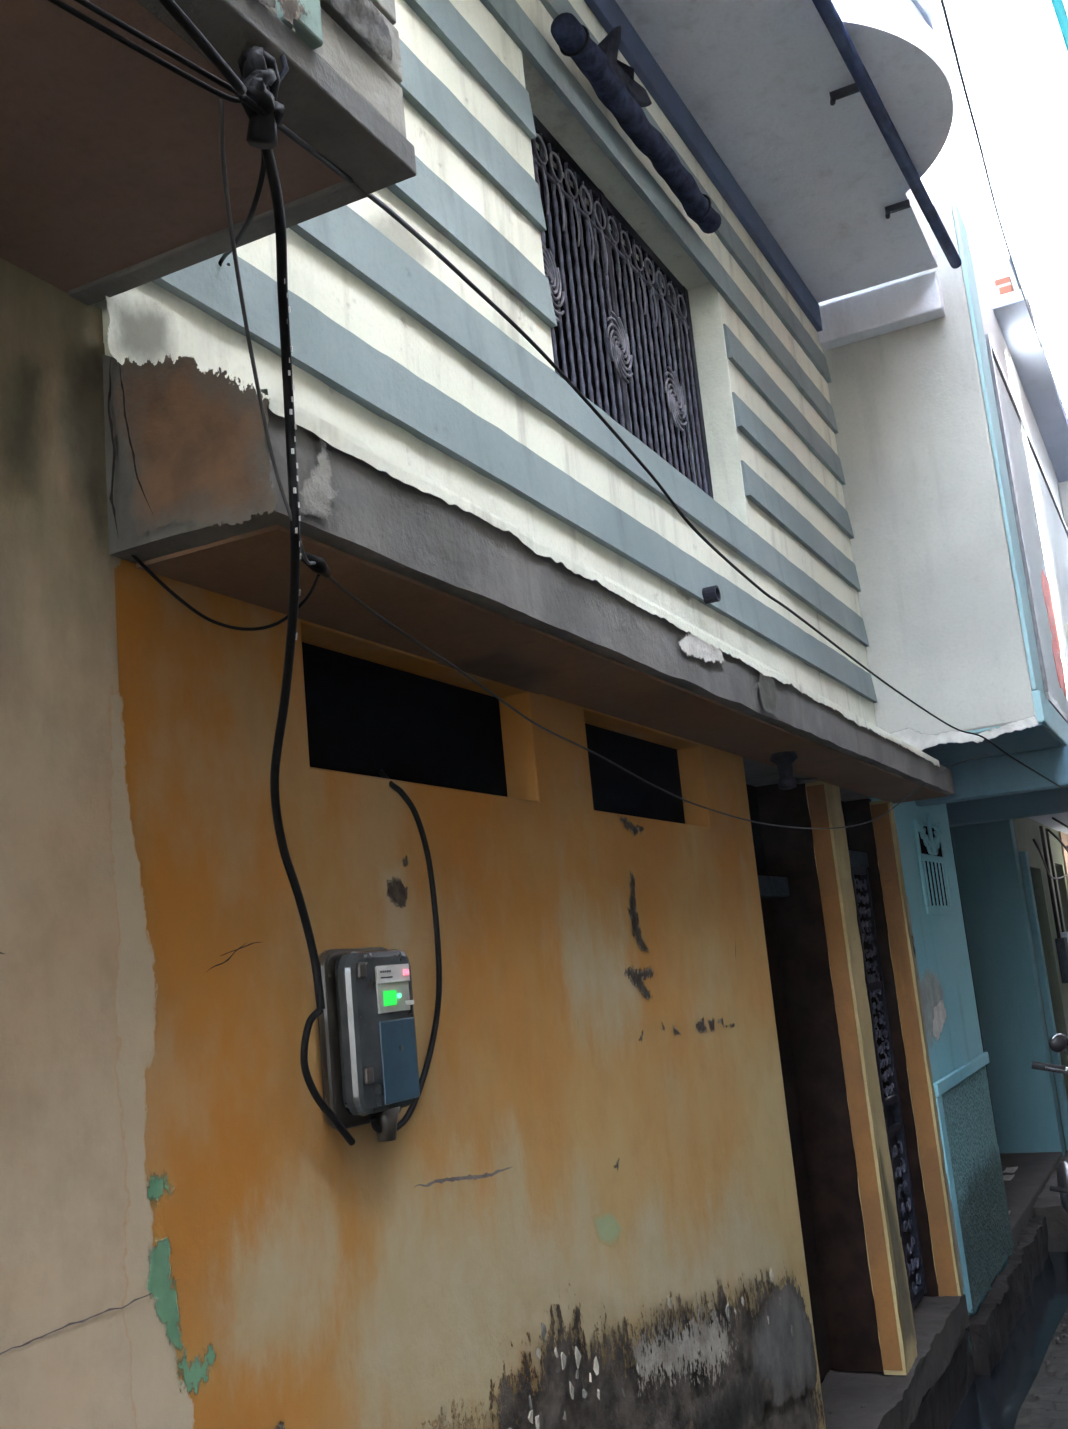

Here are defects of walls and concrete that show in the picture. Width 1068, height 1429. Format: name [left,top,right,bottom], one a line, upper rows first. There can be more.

peeling [260,389,1039,767]
spalling [624,871,654,1001]
spalling [662,1017,735,1036]
peeling [147,1172,174,1200]
crack [0,1279,180,1355]
peeling [147,1237,216,1394]
damp [487,1259,825,1429]